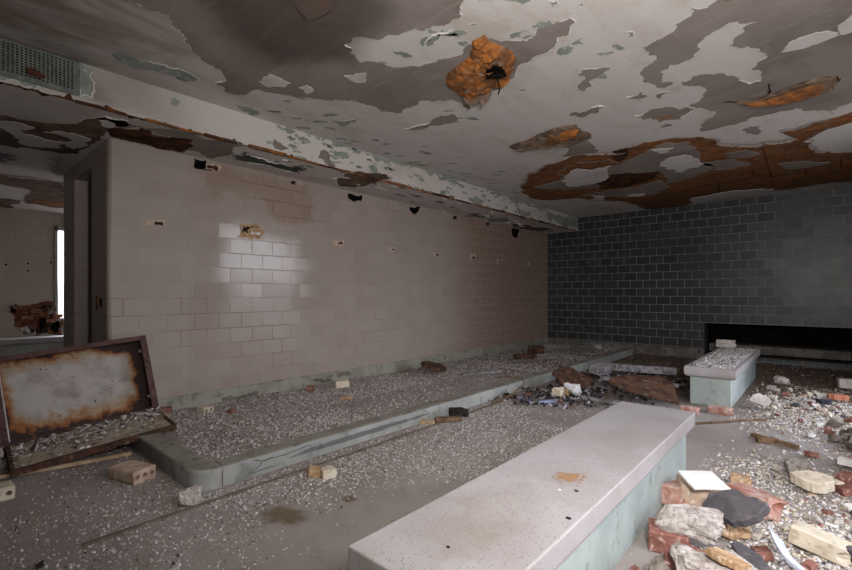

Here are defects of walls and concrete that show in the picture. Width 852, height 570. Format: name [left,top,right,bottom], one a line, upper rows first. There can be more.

peeling [128,0,474,131]
peeling [488,17,577,80]
flaking render [519,0,852,210]
peeling [0,115,313,185]
flaking render [0,173,64,208]
spalling [238,223,264,240]
peeling [318,150,425,215]
peeling [435,197,557,238]
crack [251,445,312,473]